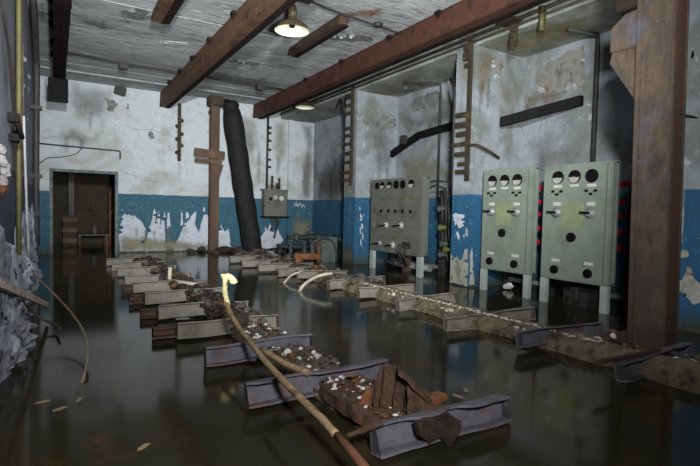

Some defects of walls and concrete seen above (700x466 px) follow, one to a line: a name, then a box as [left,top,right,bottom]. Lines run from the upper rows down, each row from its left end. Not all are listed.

peeling [118,7,152,21]
flaking render [535,46,586,95]
peeling [118,207,208,252]
peeling [218,224,231,247]
peeling [261,225,284,249]
peeling [453,211,468,240]
flaking render [450,249,475,286]
peeling [680,250,700,305]